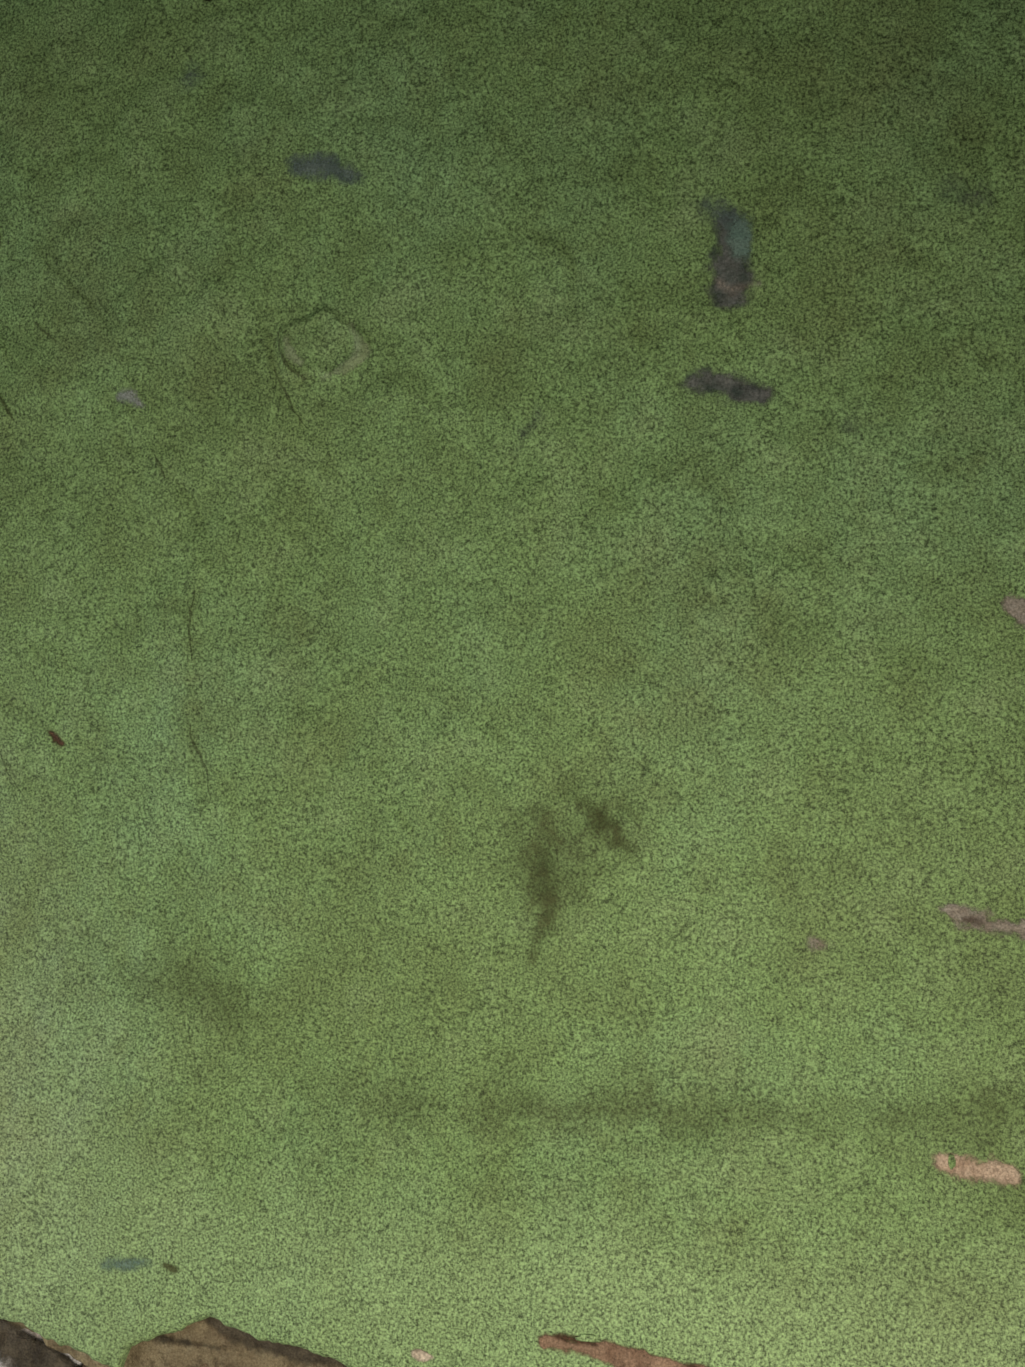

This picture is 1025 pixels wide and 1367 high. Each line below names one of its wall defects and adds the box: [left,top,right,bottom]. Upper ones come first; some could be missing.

damp [705,204,753,307]
damp [683,369,770,403]
peeling [1002,597,1025,625]
peeling [939,904,1025,940]
peeling [935,1153,1021,1185]
spalling [0,1319,335,1367]
peeling [412,1349,433,1362]
spalling [539,1334,706,1367]